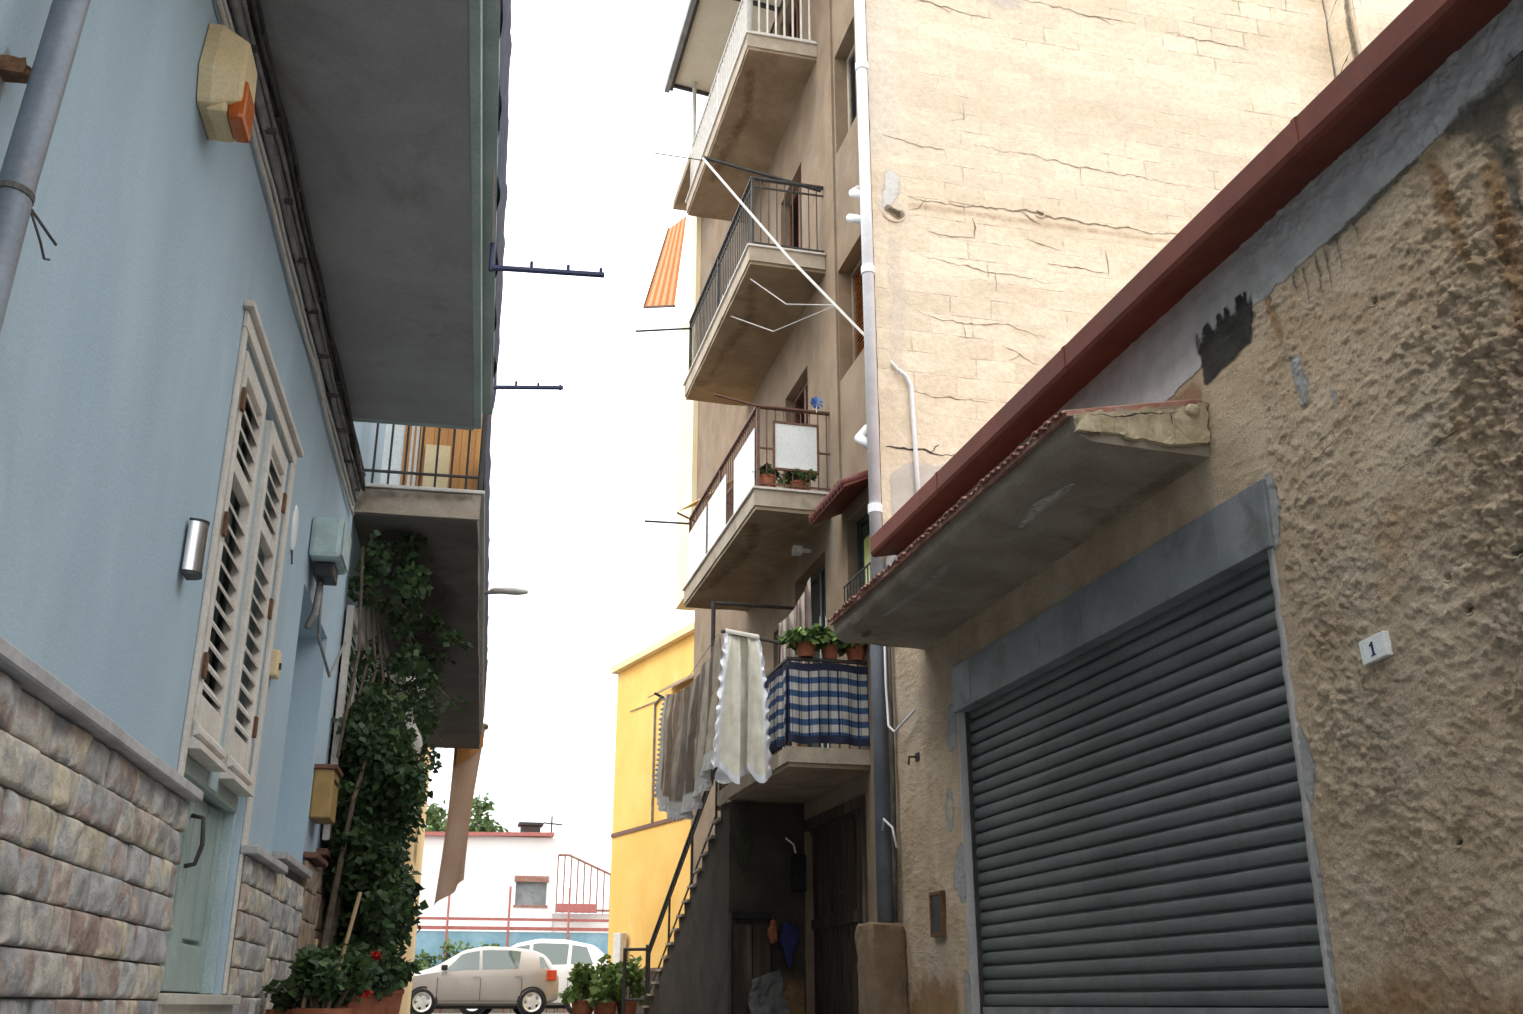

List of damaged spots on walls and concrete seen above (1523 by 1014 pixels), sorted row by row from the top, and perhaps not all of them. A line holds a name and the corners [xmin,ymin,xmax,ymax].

crack [881,105,1190,187]
water stain [1444,52,1523,216]
crack [908,196,1176,364]
corrosion [1425,157,1471,266]
corrosion [1484,162,1523,345]
water stain [1196,291,1253,385]
water stain [1341,974,1523,1014]